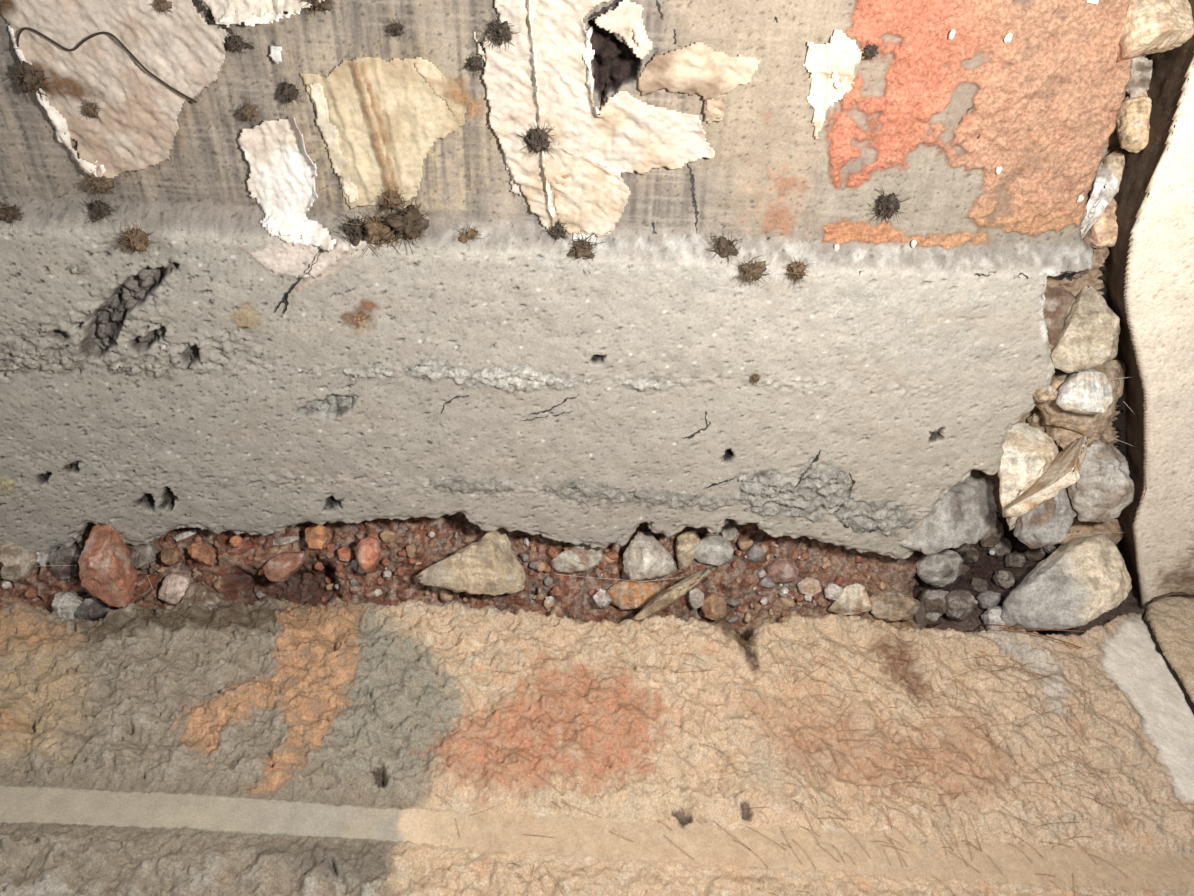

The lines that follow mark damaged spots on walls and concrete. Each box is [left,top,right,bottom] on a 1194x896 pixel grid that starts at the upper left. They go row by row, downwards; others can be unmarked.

peeling [1,0,325,179]
peeling [300,56,467,210]
peeling [473,0,761,243]
peeling [237,115,359,291]
peeling [822,218,988,251]
spalling [273,536,303,546]
peeling [752,502,918,537]
spalling [828,583,872,616]
crack [1145,619,1194,715]